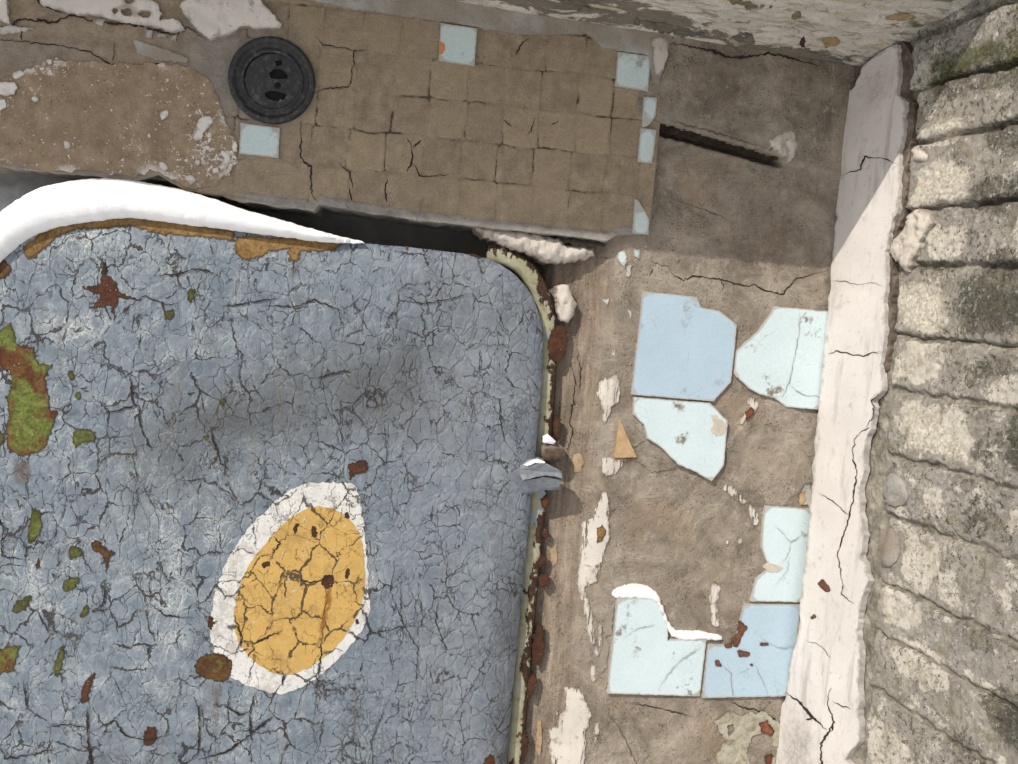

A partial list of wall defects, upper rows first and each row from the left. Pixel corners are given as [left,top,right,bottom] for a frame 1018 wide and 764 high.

peeling [40,0,282,63]
crack [660,121,778,161]
corrosion [82,262,142,318]
peeling [596,375,620,422]
crack [818,394,879,603]
peeling [578,492,614,689]
corrosion [194,653,232,683]
corrosion [724,621,753,666]
crack [0,680,165,764]
crack [187,690,273,764]
corrosion [509,730,529,764]
peeling [535,687,599,764]